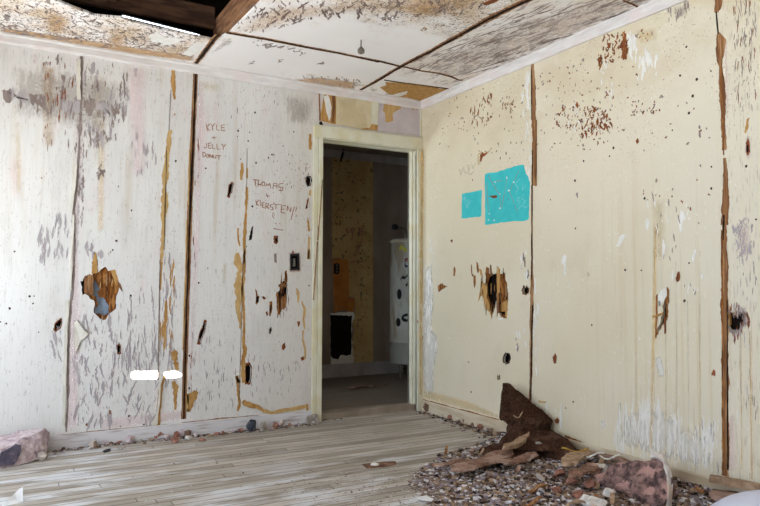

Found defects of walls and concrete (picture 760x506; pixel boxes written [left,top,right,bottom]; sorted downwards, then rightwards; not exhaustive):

peeling [0,4,203,58]
peeling [414,0,645,79]
peeling [538,29,659,150]
peeling [71,130,179,431]
peeling [186,163,306,412]
peeling [658,288,667,307]
spalling [729,218,757,359]